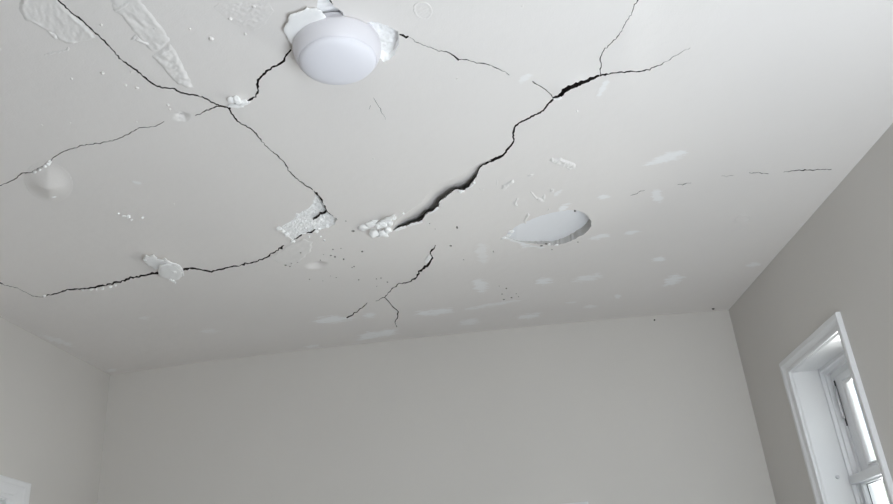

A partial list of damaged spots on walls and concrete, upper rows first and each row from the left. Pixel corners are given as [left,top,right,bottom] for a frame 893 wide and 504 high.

flaking render [19,0,95,44]
crack [58,0,313,190]
crack [393,0,689,230]
crack [0,121,164,186]
flaking render [278,191,337,240]
crack [0,272,159,297]
crack [183,245,284,273]
crack [346,245,436,327]